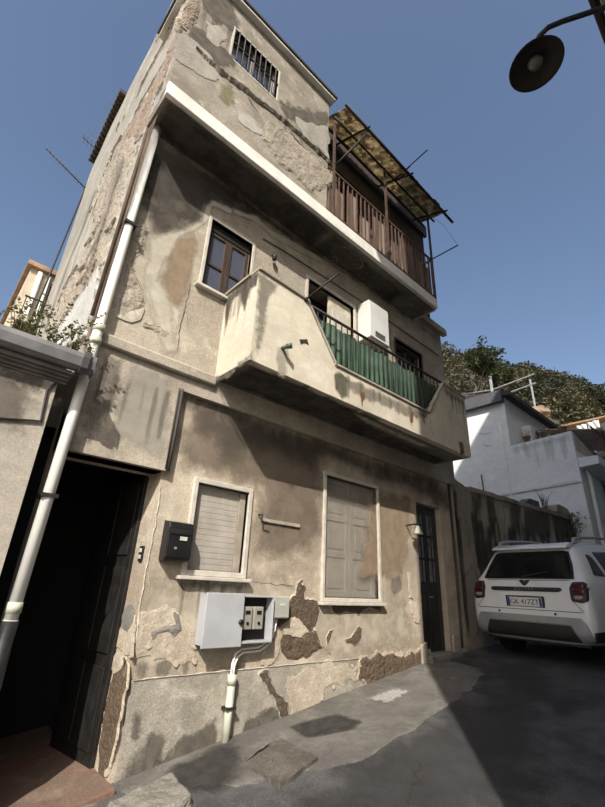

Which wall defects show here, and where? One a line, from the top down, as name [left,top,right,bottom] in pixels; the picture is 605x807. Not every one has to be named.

flaking render [51,0,202,338]
water stain [142,104,400,354]
flaking render [261,120,332,194]
water stain [83,357,119,441]
water stain [116,369,169,451]
water stain [216,349,443,462]
flaking render [97,604,197,780]
water stain [143,573,295,675]
water stain [292,715,361,737]
flaking render [257,571,431,718]
water stain [301,495,411,658]
water stain [365,466,573,640]